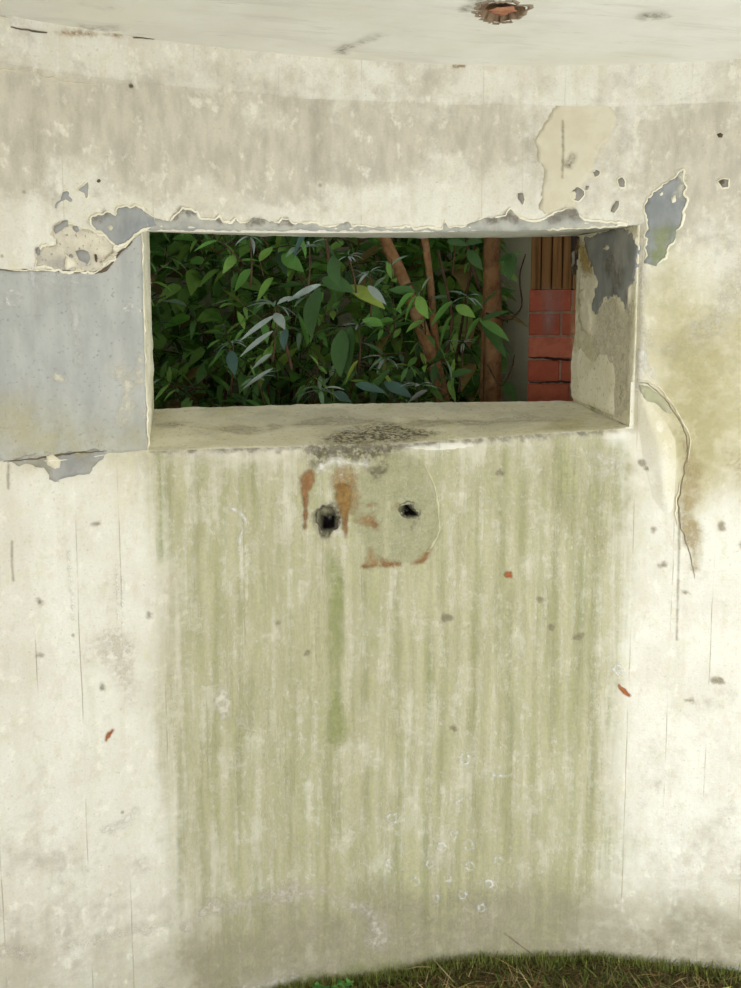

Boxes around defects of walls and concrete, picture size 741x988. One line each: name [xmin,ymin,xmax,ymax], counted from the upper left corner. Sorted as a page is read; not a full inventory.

peeling [0,168,689,482]
corrosion [301,470,315,529]
corrosion [333,469,356,532]
crack [638,380,700,577]
corrosion [363,550,401,567]